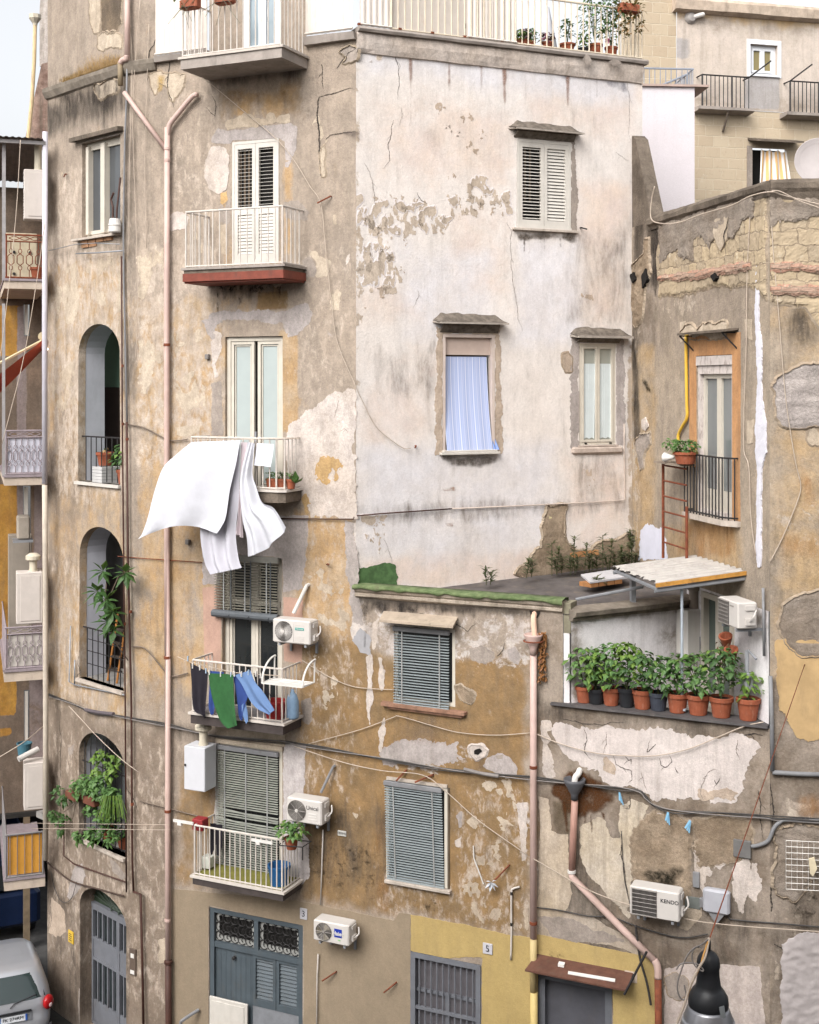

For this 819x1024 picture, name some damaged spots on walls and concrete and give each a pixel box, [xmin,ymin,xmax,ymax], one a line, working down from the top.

spalling [148,69,187,103]
crack [316,49,355,176]
spalling [346,174,514,326]
spalling [630,196,819,330]
spalling [770,361,819,447]
peeling [286,388,387,556]
spalling [513,502,640,578]
peeling [774,588,819,742]
peeling [455,811,485,847]
corrosion [552,771,612,826]
peeling [467,720,819,955]
peeling [462,882,501,924]